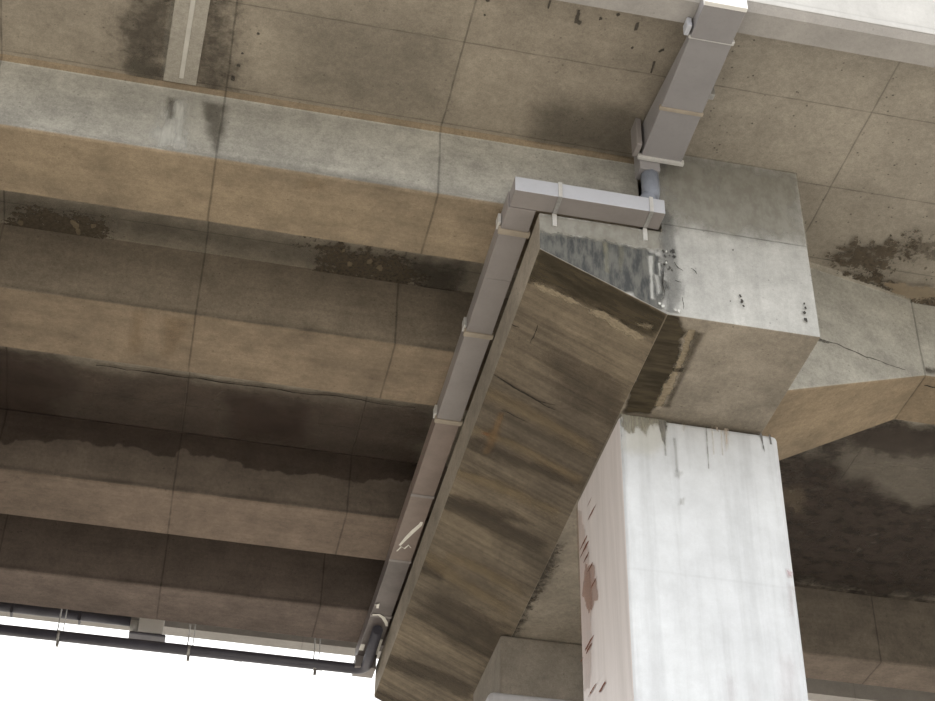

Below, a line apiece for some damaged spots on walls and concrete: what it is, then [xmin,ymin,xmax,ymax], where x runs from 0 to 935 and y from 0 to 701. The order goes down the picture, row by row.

water stain [121,0,169,75]
water stain [153,101,187,148]
water stain [207,104,221,139]
peeling [1,204,113,239]
peeling [293,236,456,291]
peeling [825,230,935,306]
water stain [528,216,695,443]
crack [818,339,905,370]
water stain [0,349,429,464]
water stain [444,496,542,551]
water stain [779,424,935,602]
water stain [386,655,470,697]